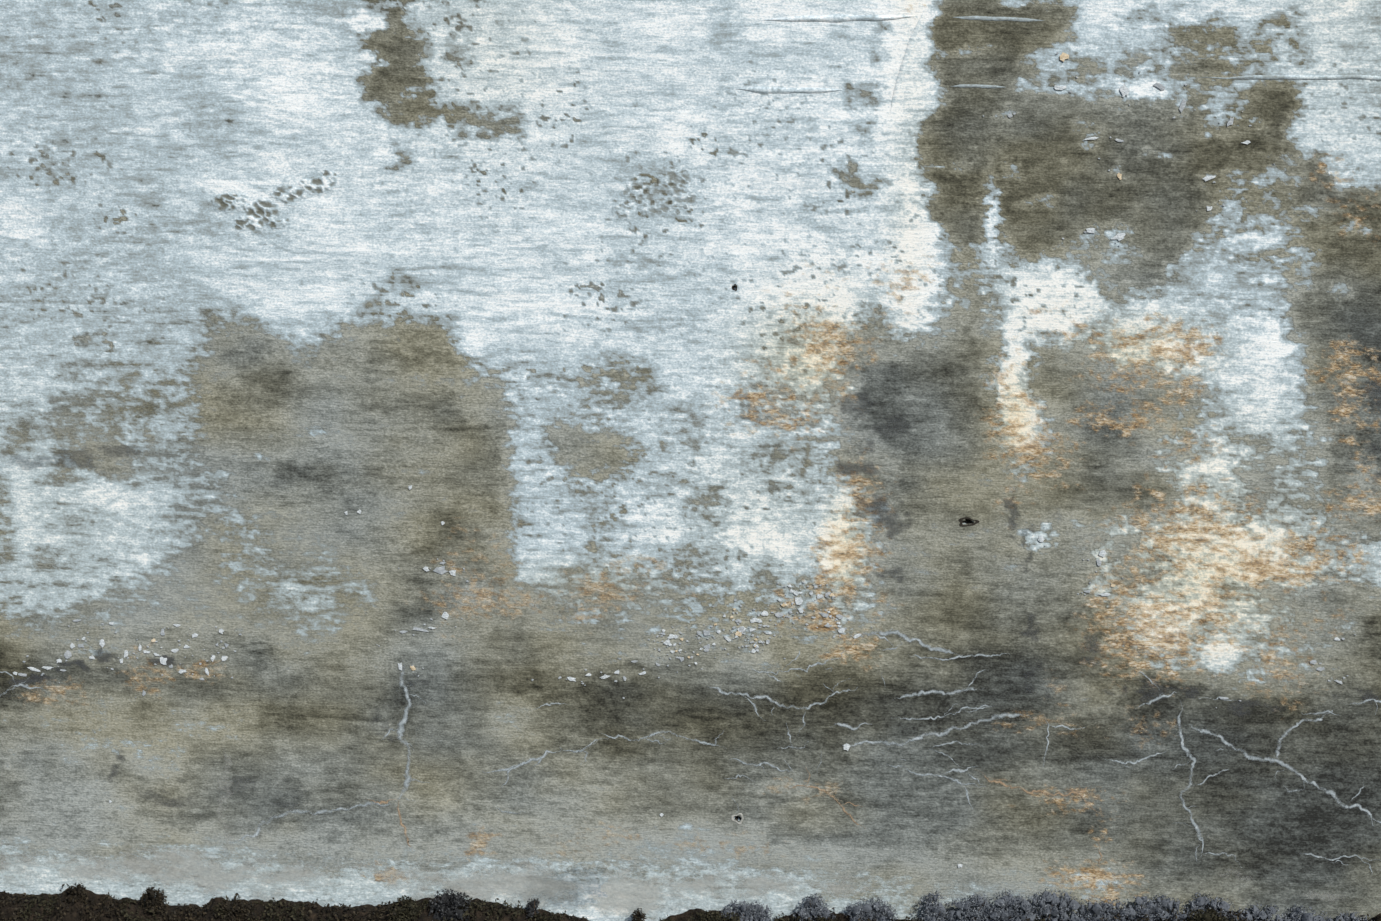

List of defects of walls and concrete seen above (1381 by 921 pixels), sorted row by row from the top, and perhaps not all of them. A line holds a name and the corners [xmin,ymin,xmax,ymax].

rust [1082,341,1381,684]
leakage [10,649,111,687]
crack [242,672,429,846]
crack [482,630,1094,828]
crack [1112,672,1381,868]
efflorescence [414,864,717,913]
crack [1306,853,1372,872]